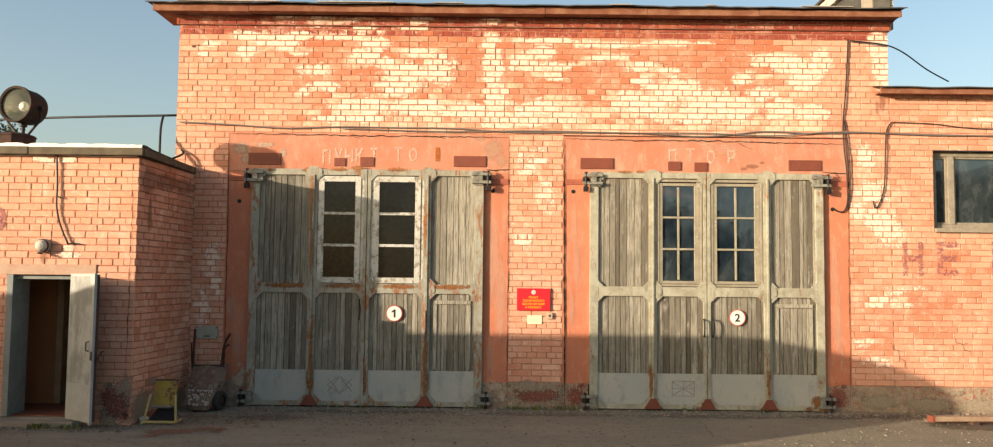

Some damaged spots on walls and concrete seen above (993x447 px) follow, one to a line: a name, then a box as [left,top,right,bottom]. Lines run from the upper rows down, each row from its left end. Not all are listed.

peeling [196,40,221,56]
peeling [232,16,834,128]
corrosion [435,284,475,294]
spalling [98,373,186,426]
spalling [487,379,588,408]
corrosion [807,396,826,412]